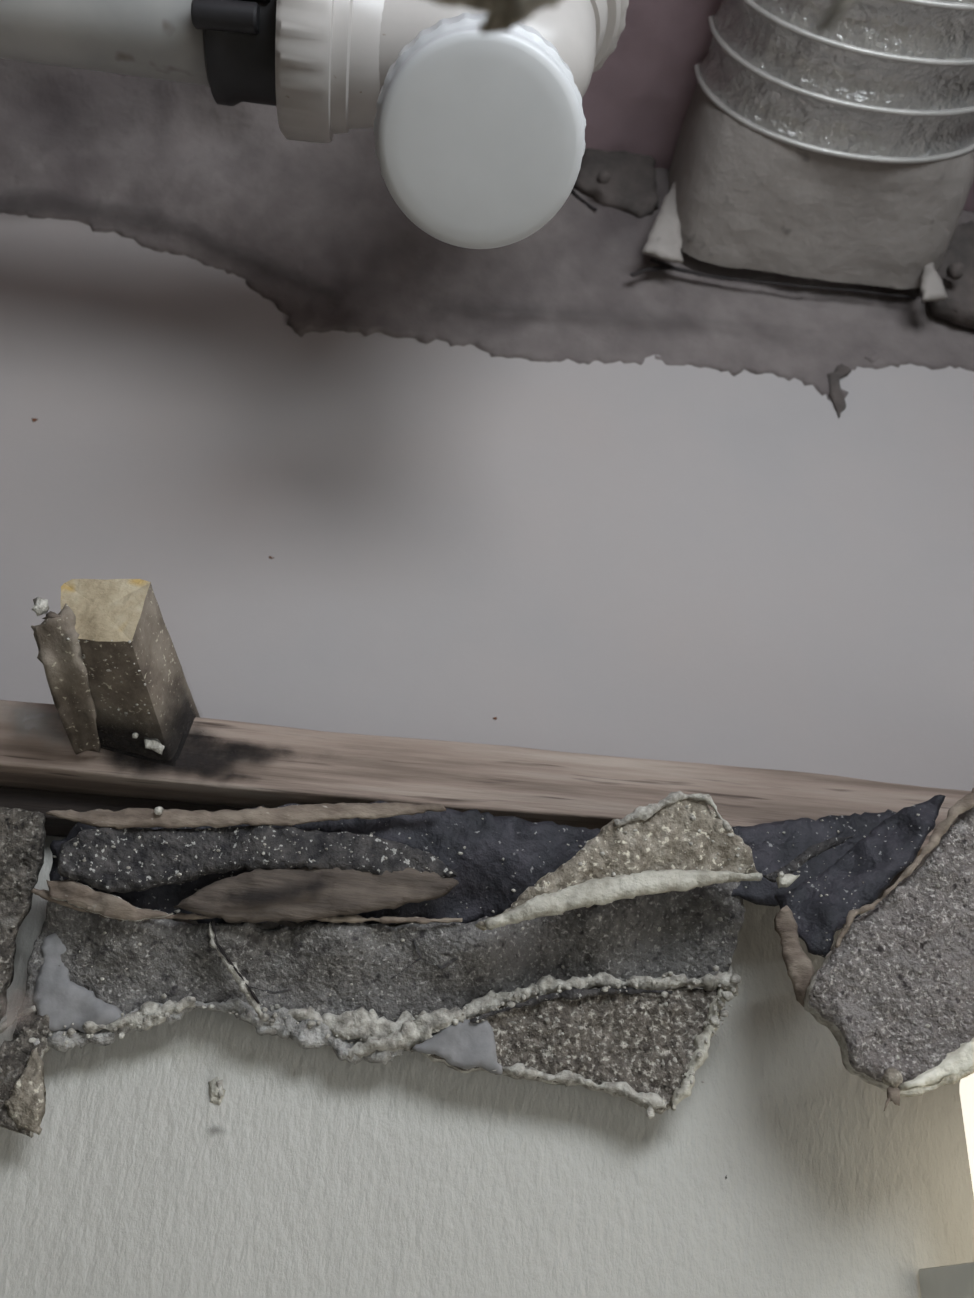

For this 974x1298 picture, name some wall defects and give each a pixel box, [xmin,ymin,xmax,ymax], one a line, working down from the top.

spalling [431,0,561,34]
spalling [814,0,855,34]
peeling [475,791,800,931]
spalling [0,967,739,1138]
spalling [899,1038,974,1091]